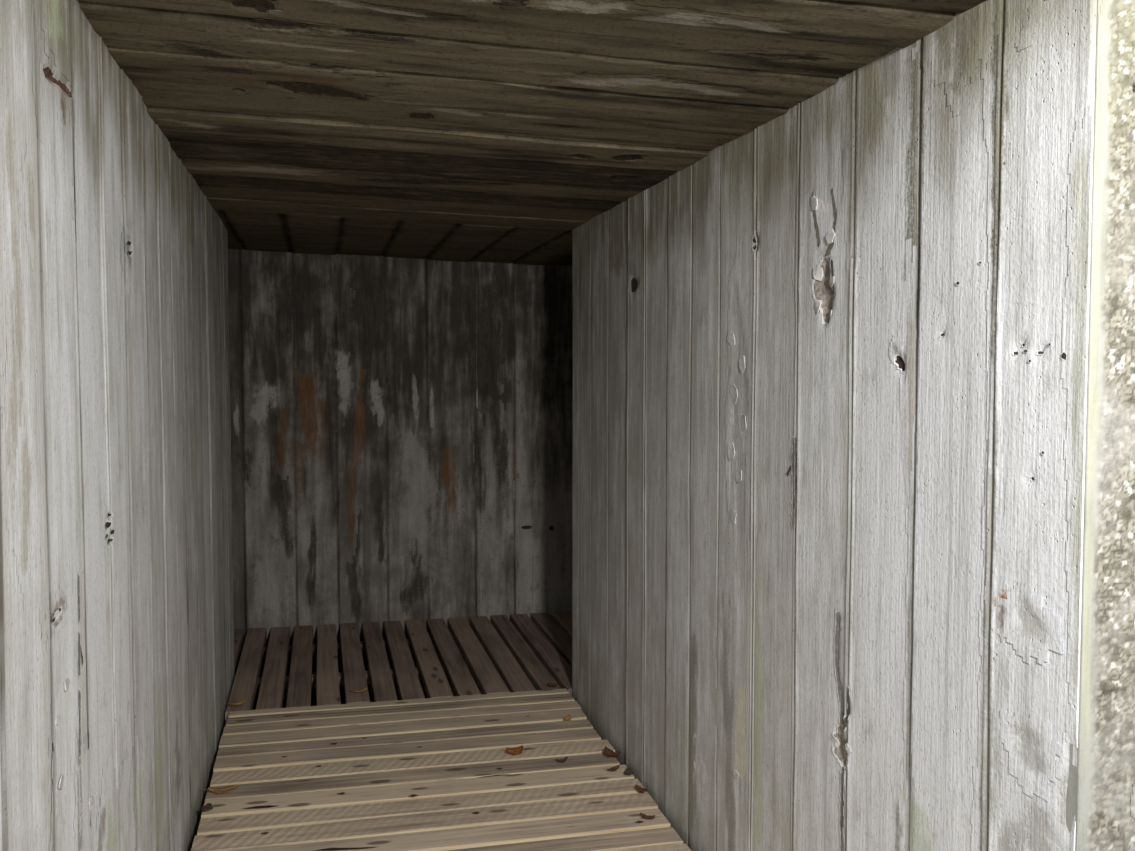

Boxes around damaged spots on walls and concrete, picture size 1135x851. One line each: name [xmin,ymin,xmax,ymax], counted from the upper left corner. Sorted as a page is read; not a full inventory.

damp [133,23,498,75]
damp [182,161,561,190]
peeling [808,186,837,326]
damp [231,252,407,629]
damp [287,0,1039,851]
damp [49,743,58,851]
damp [74,710,85,851]